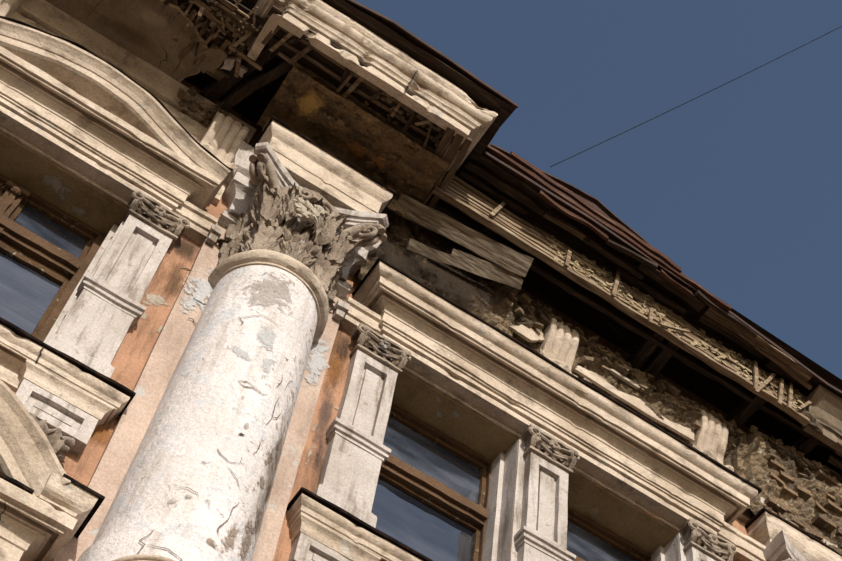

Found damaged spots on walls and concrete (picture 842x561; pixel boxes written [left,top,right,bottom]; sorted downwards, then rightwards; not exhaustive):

spalling [160,0,472,217]
spalling [293,197,326,224]
peeling [235,272,307,315]
peeling [232,346,252,362]
peeling [256,324,278,378]
peeling [305,335,331,385]
spalling [385,220,842,555]
crack [218,375,293,536]
peeling [207,442,281,561]
crack [136,529,182,561]